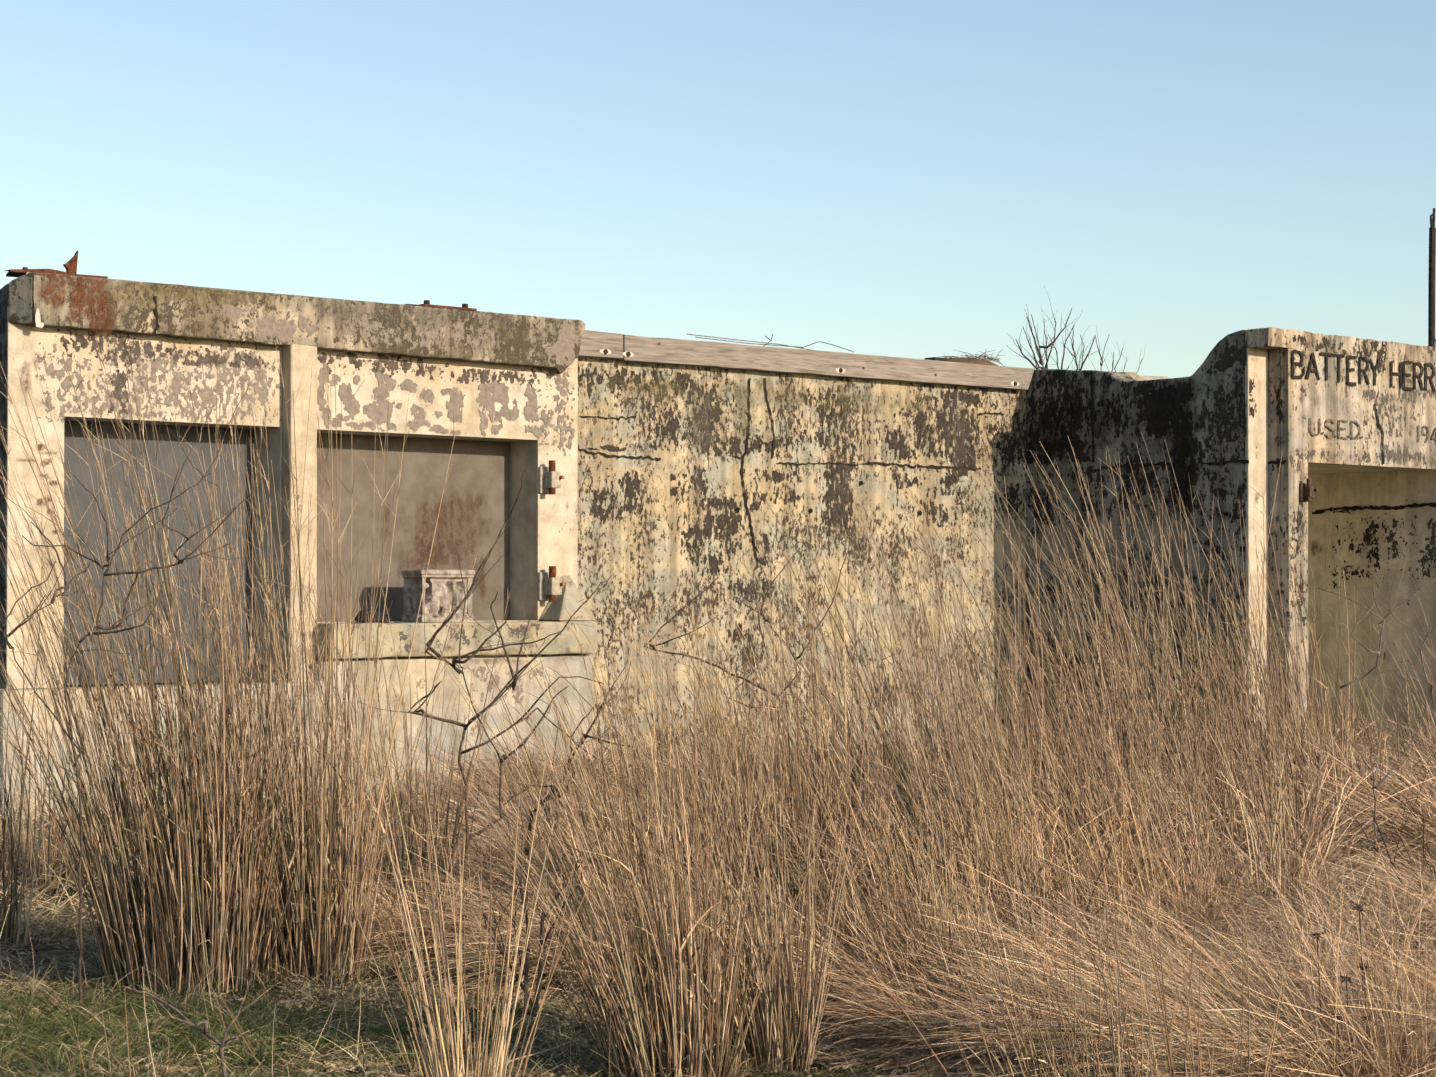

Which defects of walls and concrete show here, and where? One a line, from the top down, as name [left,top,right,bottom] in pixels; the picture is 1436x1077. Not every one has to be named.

corrosion [41,274,113,333]
peeling [34,275,318,425]
peeling [317,302,856,666]
crack [732,378,1004,568]
peeling [1293,335,1436,466]
peeling [1329,512,1436,589]